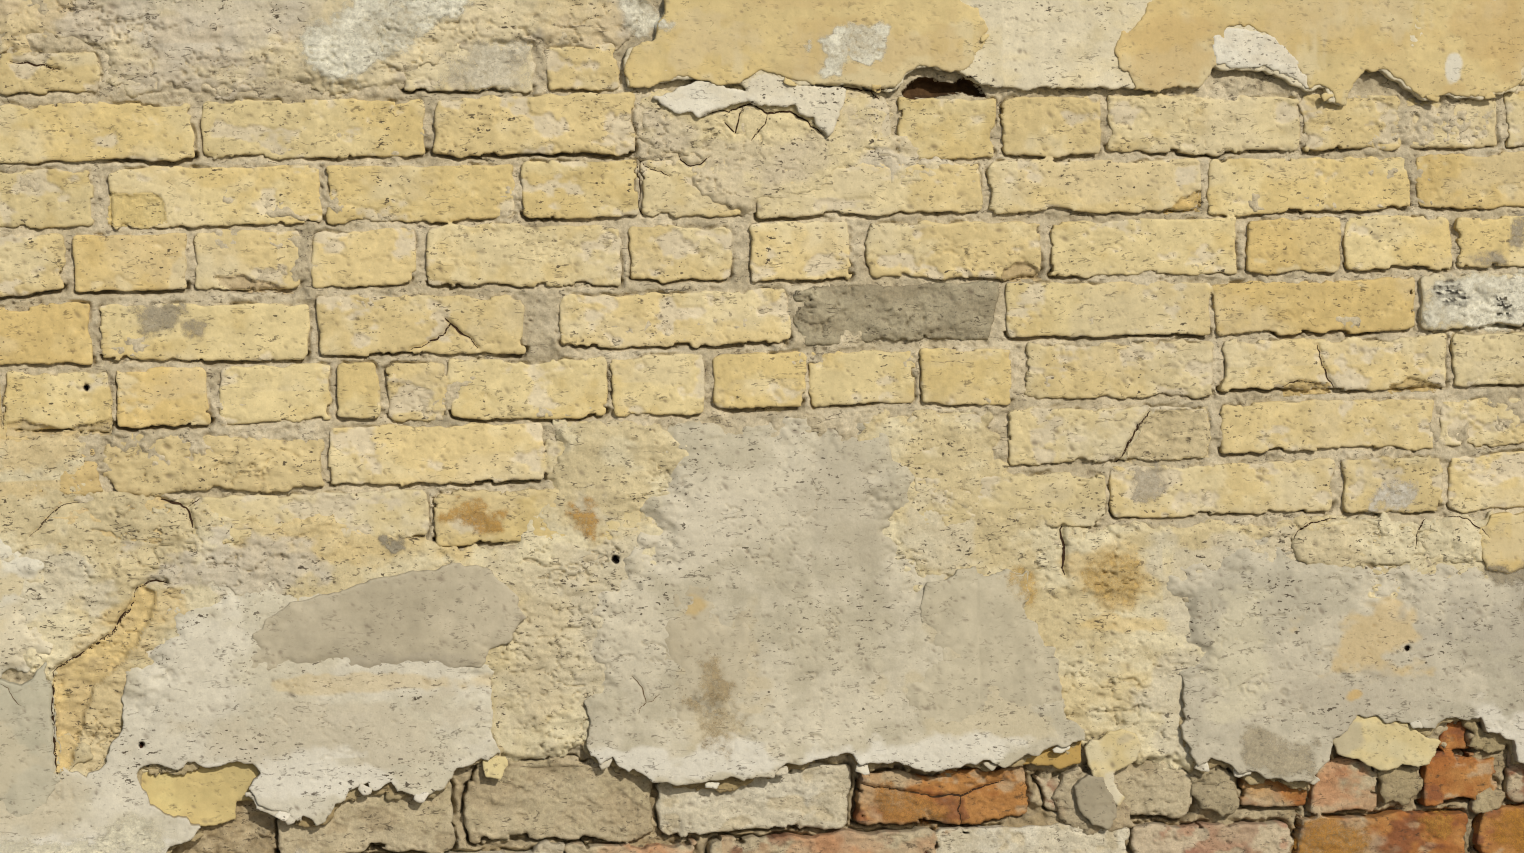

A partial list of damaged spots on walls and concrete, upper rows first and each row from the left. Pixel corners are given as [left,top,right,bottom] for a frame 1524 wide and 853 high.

flaking render [0,0,1524,216]
spalling [106,192,167,229]
spalling [213,274,294,295]
spalling [793,261,1042,346]
spalling [1279,379,1331,397]
spalling [1387,377,1443,394]
peeling [0,393,1524,853]